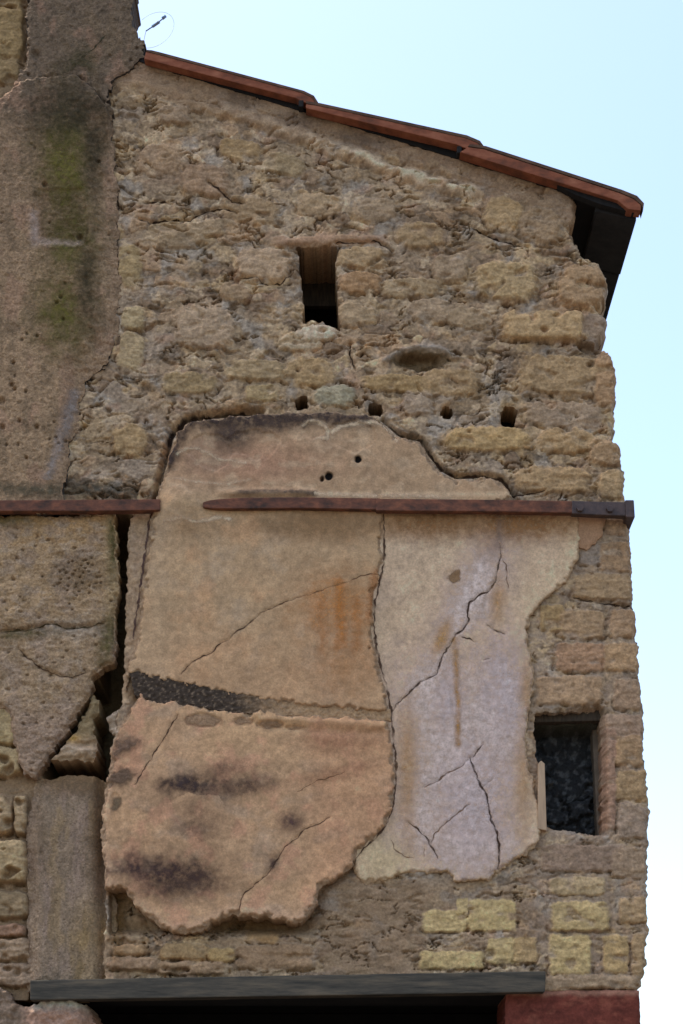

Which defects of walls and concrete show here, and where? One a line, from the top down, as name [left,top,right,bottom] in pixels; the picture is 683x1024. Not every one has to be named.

crack [184,515,509,866]
crack [136,715,178,783]
crack [239,817,330,908]